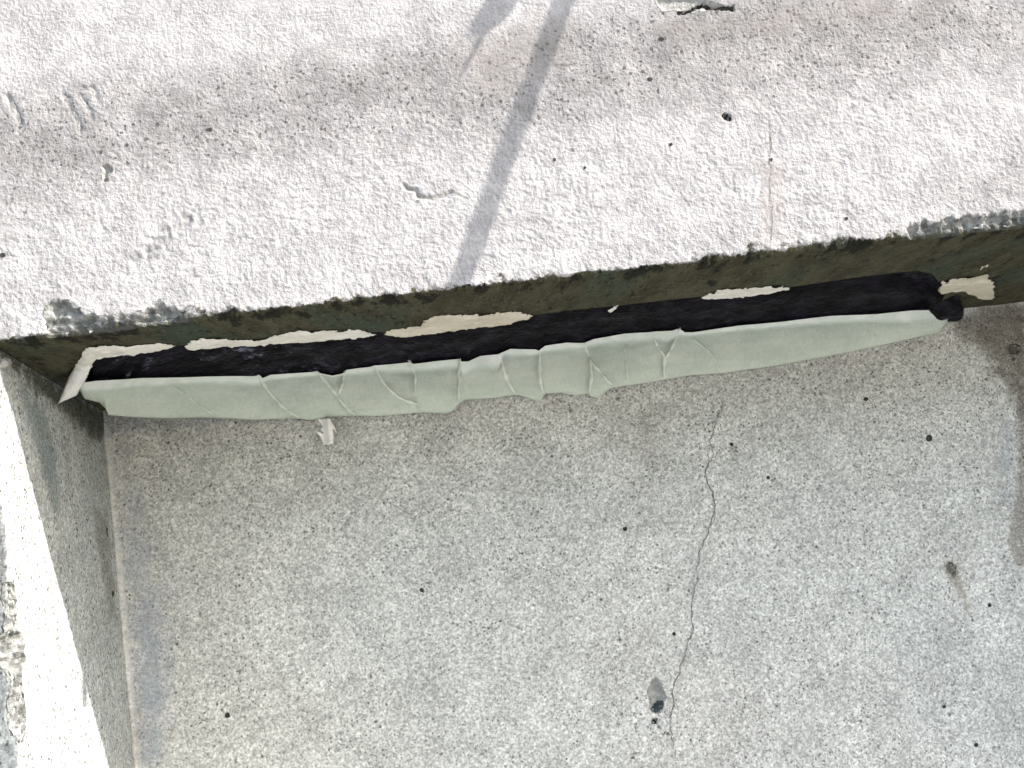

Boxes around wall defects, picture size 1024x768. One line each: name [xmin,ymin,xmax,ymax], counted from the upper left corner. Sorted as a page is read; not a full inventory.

spalling [44,298,190,333]
crack [670,390,725,768]